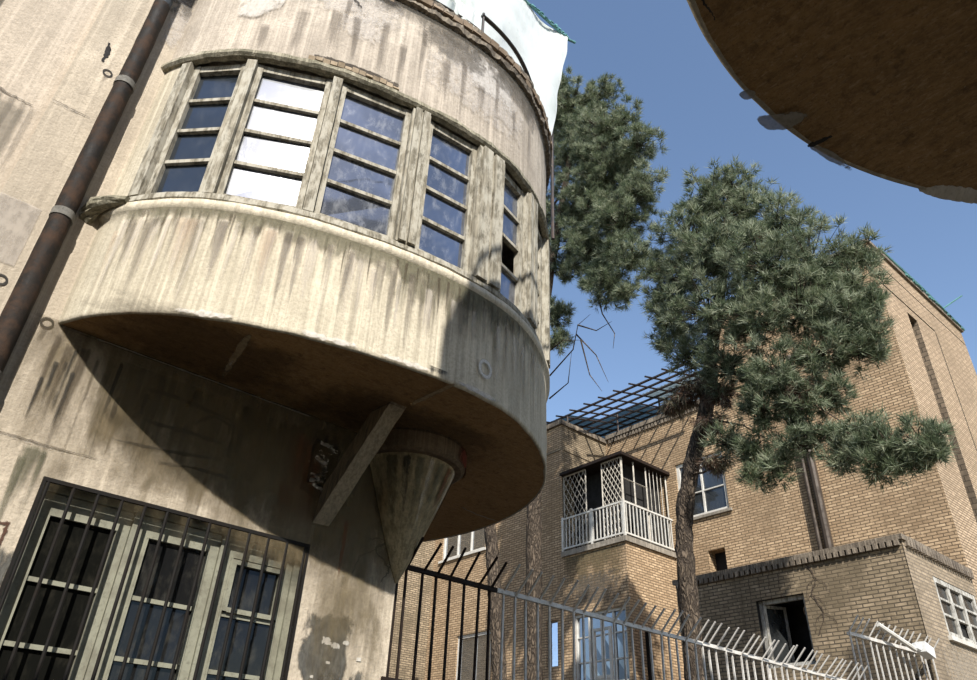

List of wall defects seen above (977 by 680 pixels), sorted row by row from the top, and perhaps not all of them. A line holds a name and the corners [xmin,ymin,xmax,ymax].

peeling [739,89,756,100]
peeling [757,111,807,130]
peeling [807,135,851,170]
leakage [126,207,542,357]
leakage [0,446,46,510]
leakage [28,327,424,647]
flaking render [0,550,13,584]
flaking render [298,614,361,680]